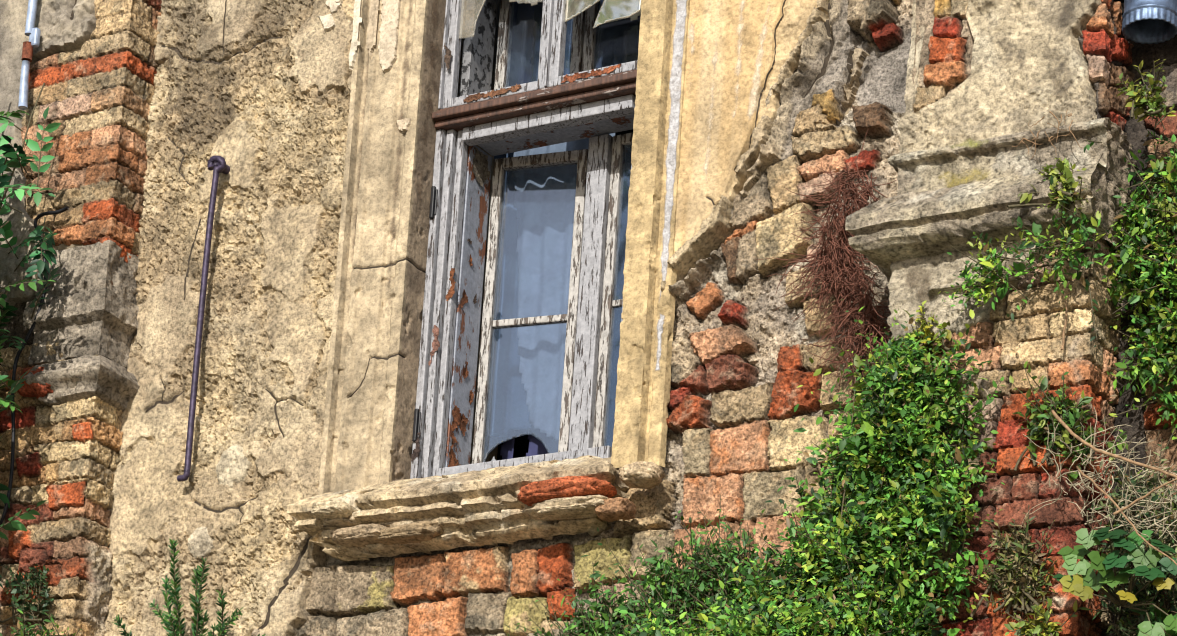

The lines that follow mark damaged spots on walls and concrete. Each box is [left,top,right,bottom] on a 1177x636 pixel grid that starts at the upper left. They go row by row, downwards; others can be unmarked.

spalling [21,0,162,263]
crack [734,0,865,170]
spalling [0,302,123,636]
crack [265,389,303,437]
crack [348,353,405,398]
crack [354,258,426,273]
spalling [295,0,974,636]
spalling [891,0,1177,636]
crack [251,537,311,636]